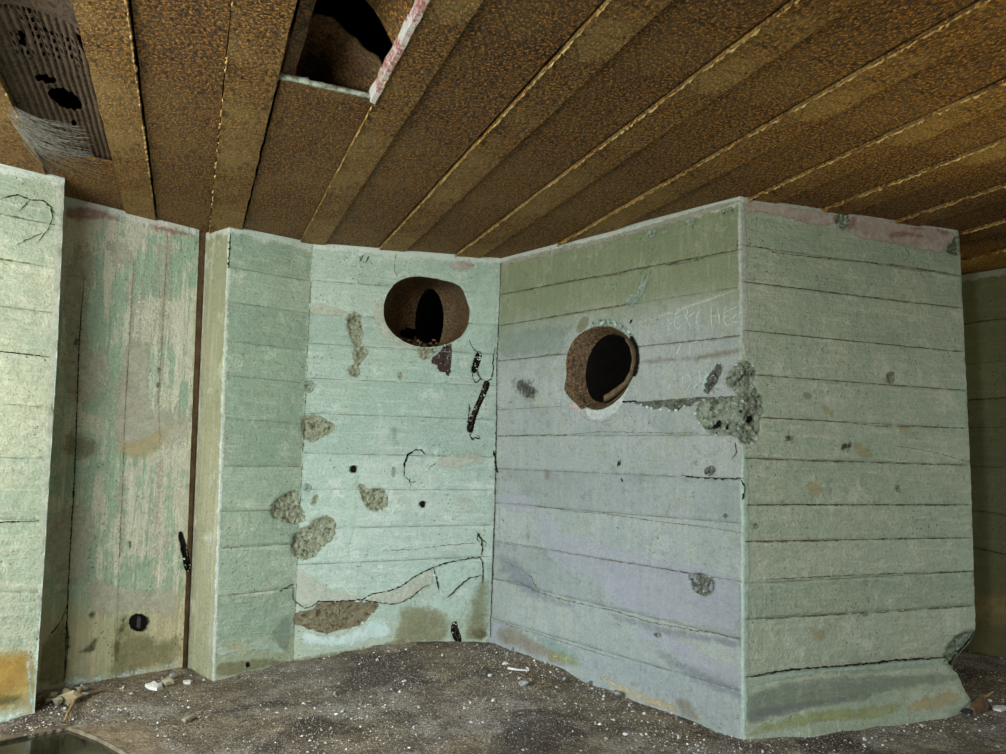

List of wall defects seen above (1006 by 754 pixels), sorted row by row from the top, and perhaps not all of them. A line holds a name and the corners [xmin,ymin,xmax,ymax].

crack [0,194,60,264]
crack [0,350,45,358]
spalling [345,312,368,377]
peeling [373,298,436,360]
spalling [626,200,960,445]
crack [49,277,85,678]
spalling [300,414,336,442]
spalling [357,484,388,512]
crack [280,245,1006,659]
spalling [271,483,378,635]
spalling [689,573,715,596]
spalling [451,621,462,642]